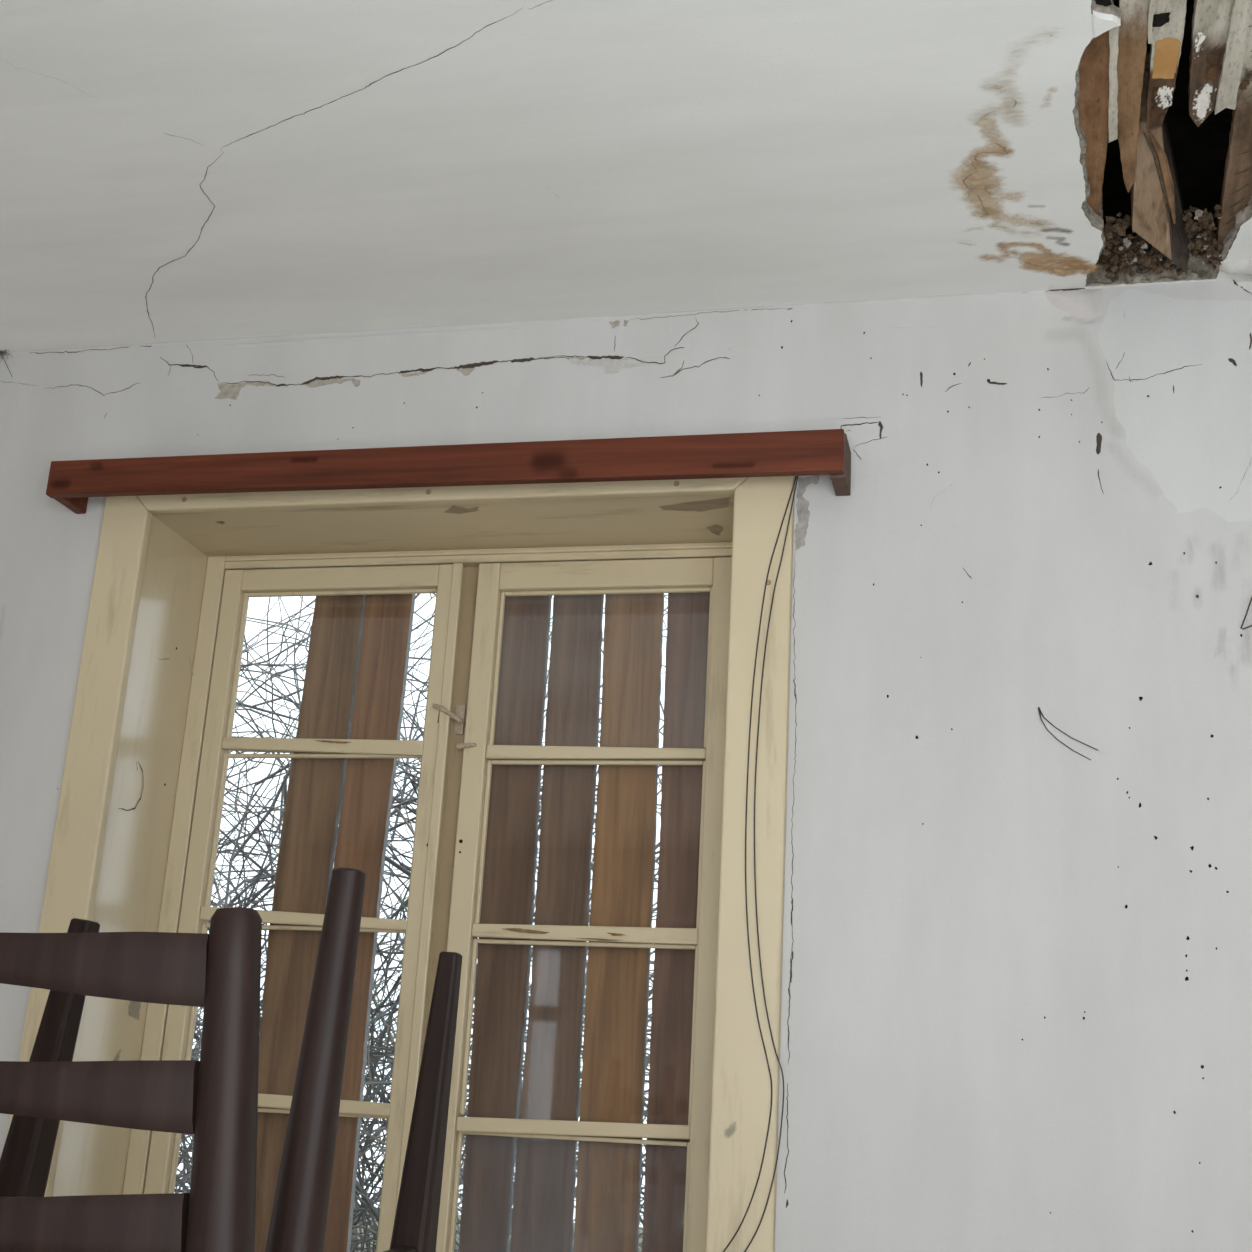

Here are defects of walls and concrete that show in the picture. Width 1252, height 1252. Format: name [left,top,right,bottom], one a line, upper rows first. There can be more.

crack [2,0,793,418]
leakage [957,111,1097,276]
spalling [1073,0,1252,286]
flaking render [215,381,275,406]
crack [841,417,886,460]